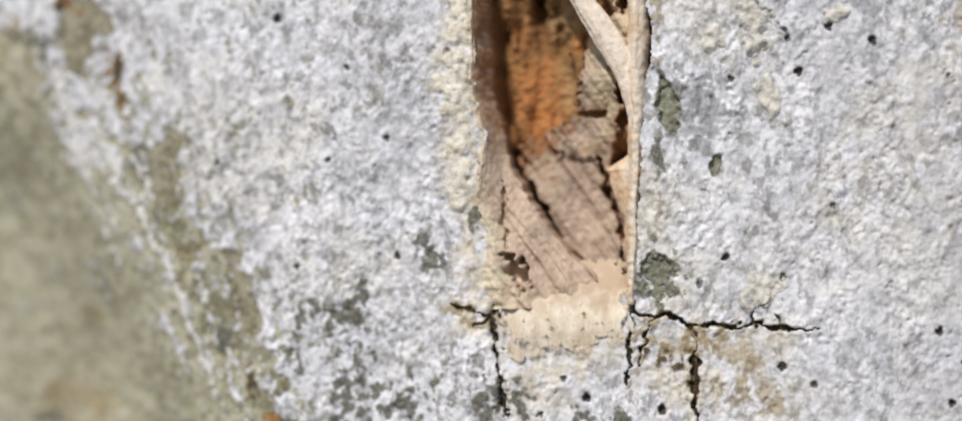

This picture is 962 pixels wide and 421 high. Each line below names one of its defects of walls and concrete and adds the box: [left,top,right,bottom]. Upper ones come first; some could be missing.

leakage [5,27,65,71]
leakage [111,55,123,84]
spalling [467,0,693,362]
crack [451,303,510,417]
crack [624,304,820,421]